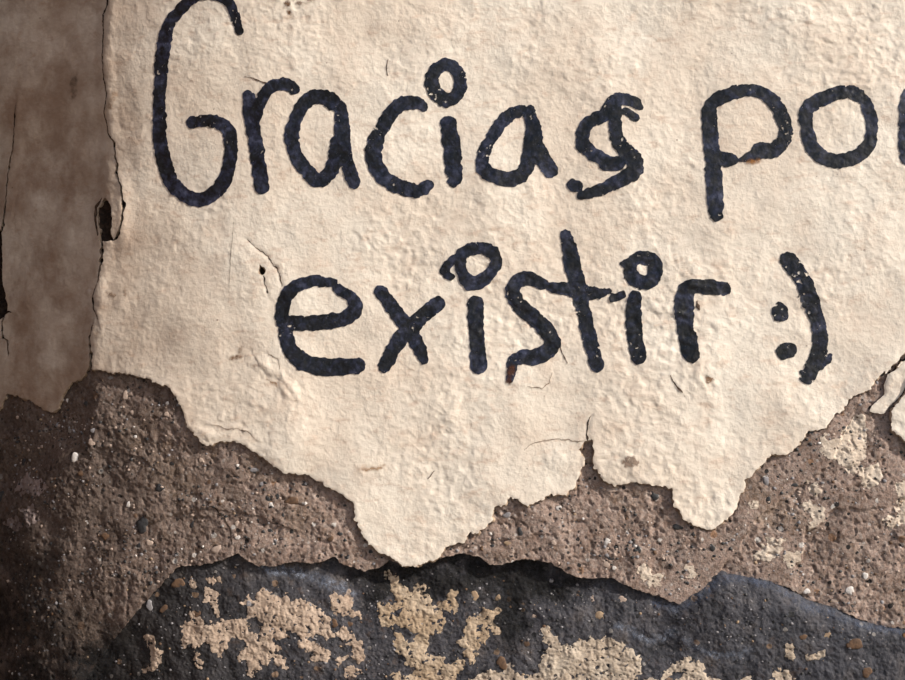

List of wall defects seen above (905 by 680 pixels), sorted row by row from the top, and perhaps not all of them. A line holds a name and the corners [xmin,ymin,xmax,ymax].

crack [92,0,126,319]
spalling [0,336,720,680]
spalling [440,355,905,629]
crack [888,358,905,411]
peeling [770,643,825,680]